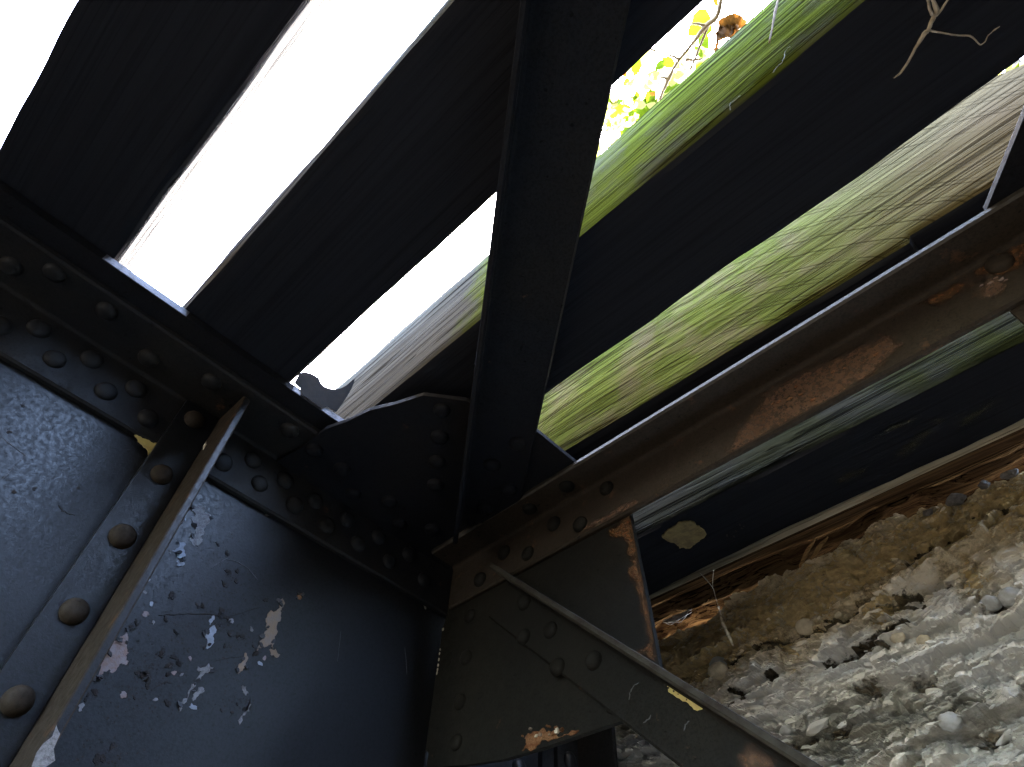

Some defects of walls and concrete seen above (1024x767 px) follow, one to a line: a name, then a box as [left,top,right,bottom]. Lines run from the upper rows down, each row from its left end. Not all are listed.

rust [917,244,1024,306]
rust [727,336,902,454]
peeling [172,505,214,566]
rust [578,500,656,659]
peeling [92,627,129,682]
peeling [202,615,222,649]
peeling [235,592,305,674]
peeling [177,664,217,708]